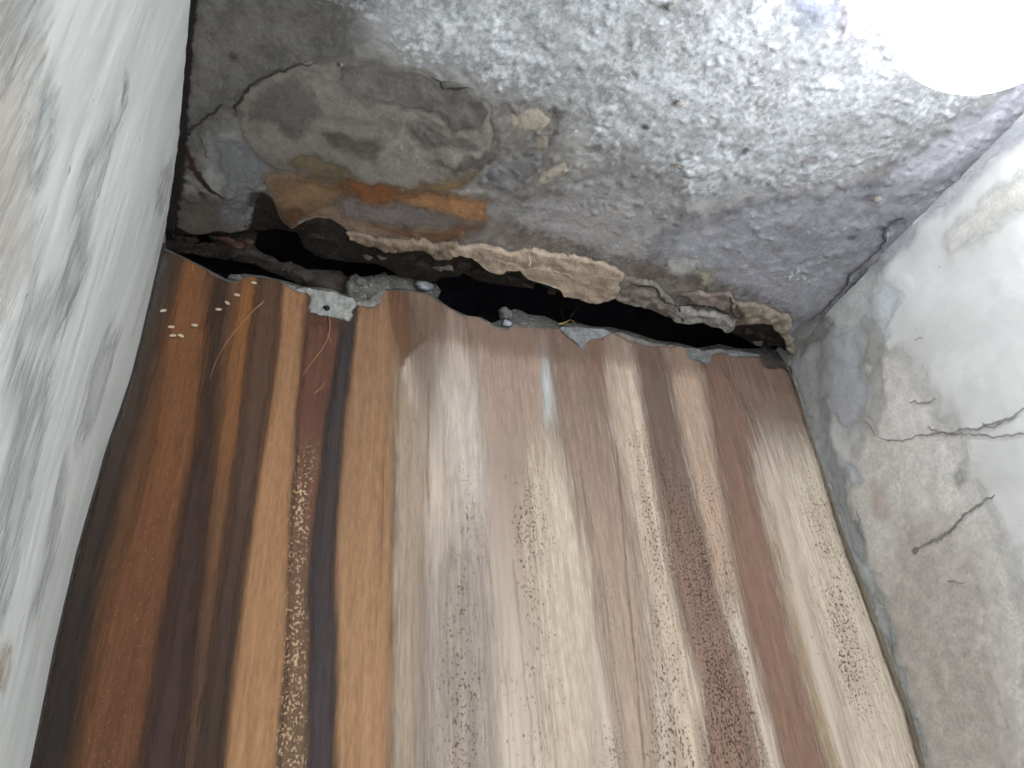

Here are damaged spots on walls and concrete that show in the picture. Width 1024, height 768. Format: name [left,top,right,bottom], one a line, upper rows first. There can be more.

crack [233,62,319,119]
damp [185,0,370,170]
damp [176,139,290,234]
corrosion [263,154,757,325]
flaking render [288,284,385,321]
flaking render [346,232,796,357]
flaking render [560,327,760,365]
crack [859,398,1024,442]
crack [913,494,995,554]